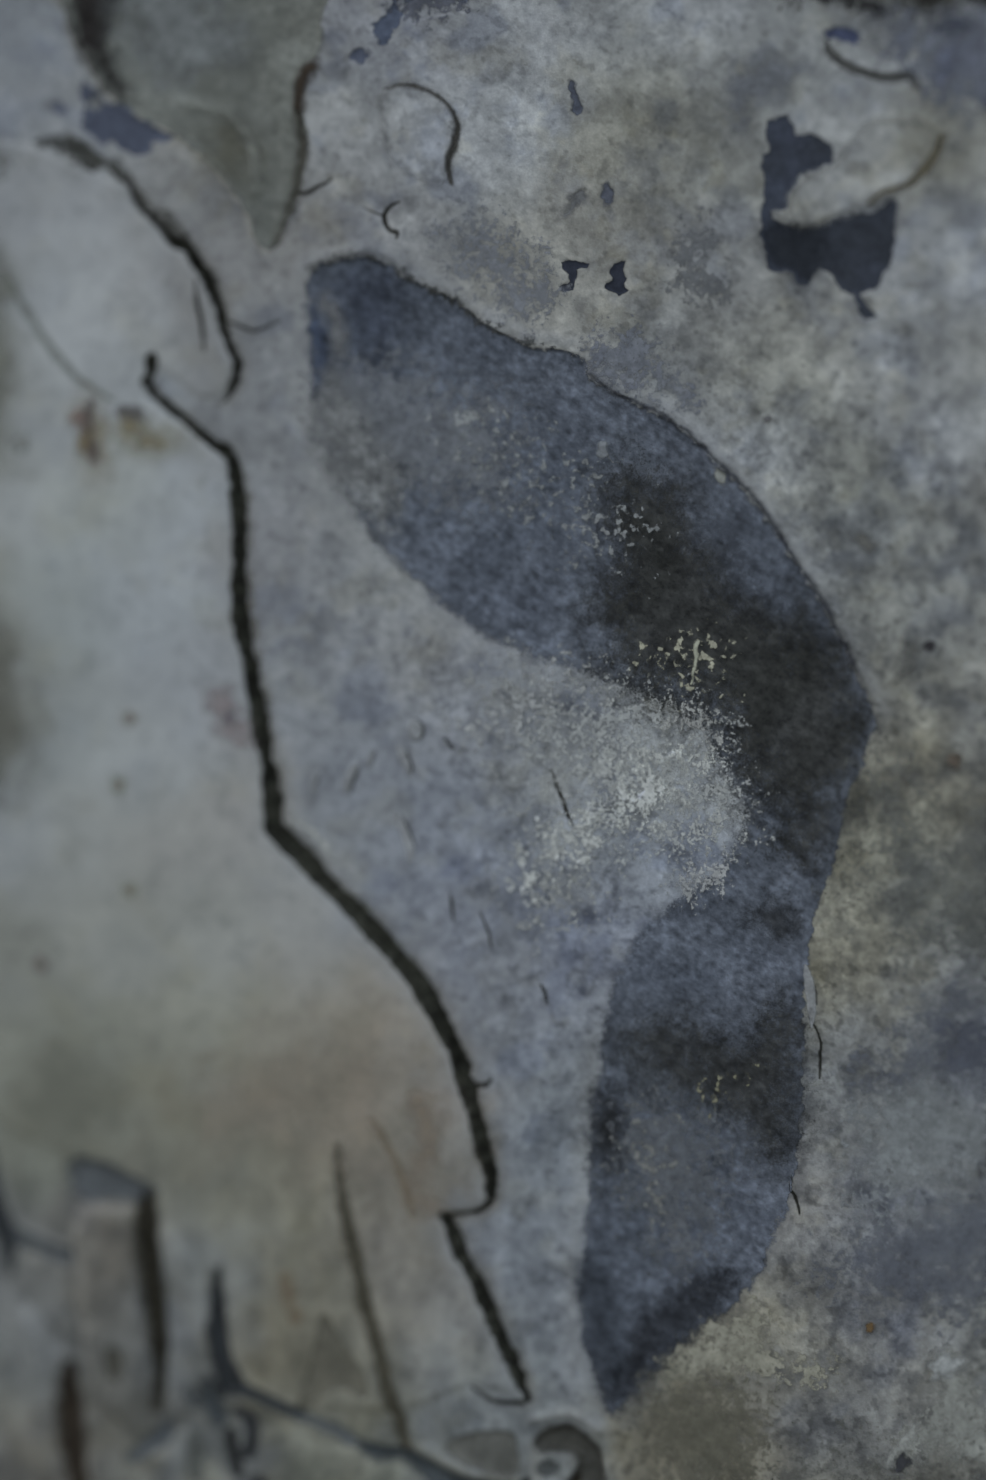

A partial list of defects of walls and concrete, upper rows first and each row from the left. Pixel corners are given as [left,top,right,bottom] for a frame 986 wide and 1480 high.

spalling [0,0,329,306]
crack [130,185,278,401]
crack [298,178,332,196]
crack [369,201,400,239]
peeling [560,260,589,292]
peeling [605,261,628,296]
peeling [759,115,898,319]
crack [141,353,532,1405]
crack [552,772,573,825]
water stain [298,205,886,1417]
water stain [814,975,986,1478]